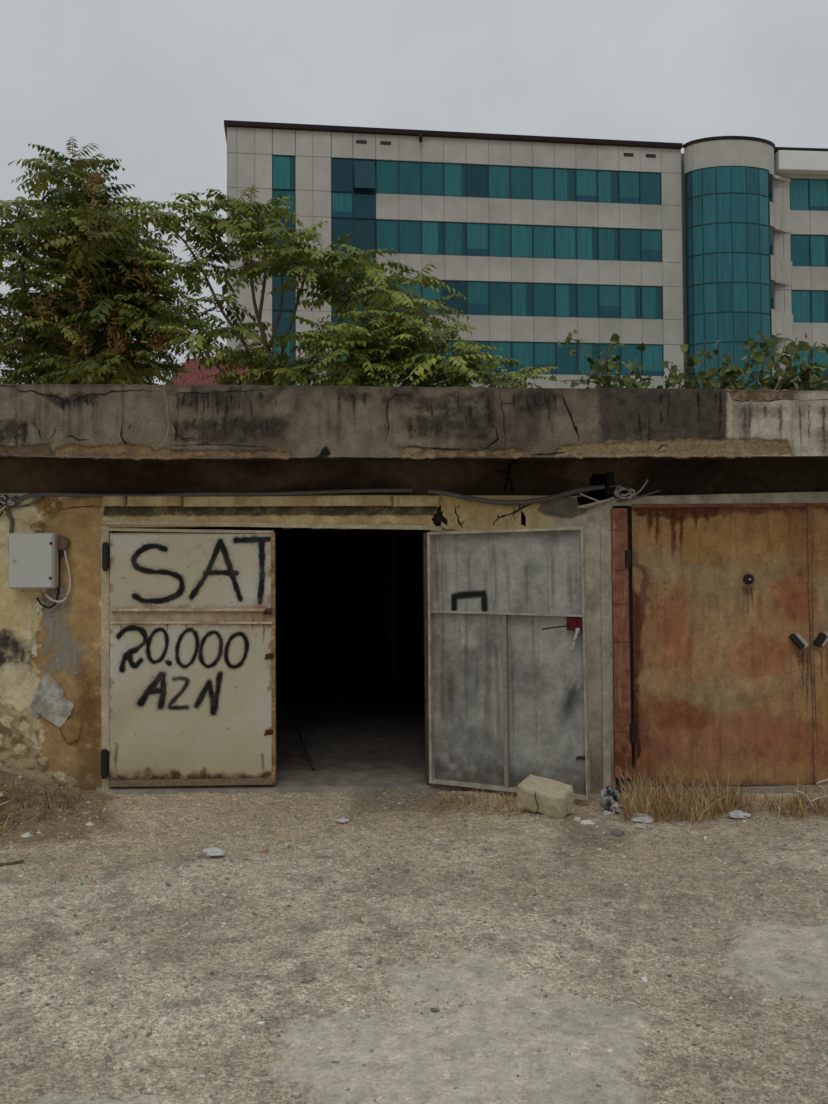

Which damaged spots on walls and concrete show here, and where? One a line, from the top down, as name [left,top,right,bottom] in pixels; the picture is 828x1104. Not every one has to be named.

crack [0,383,273,449]
damp [175,389,280,442]
crack [386,390,581,525]
corrosion [634,507,718,548]
peeling [30,592,45,679]
spalling [0,703,76,787]